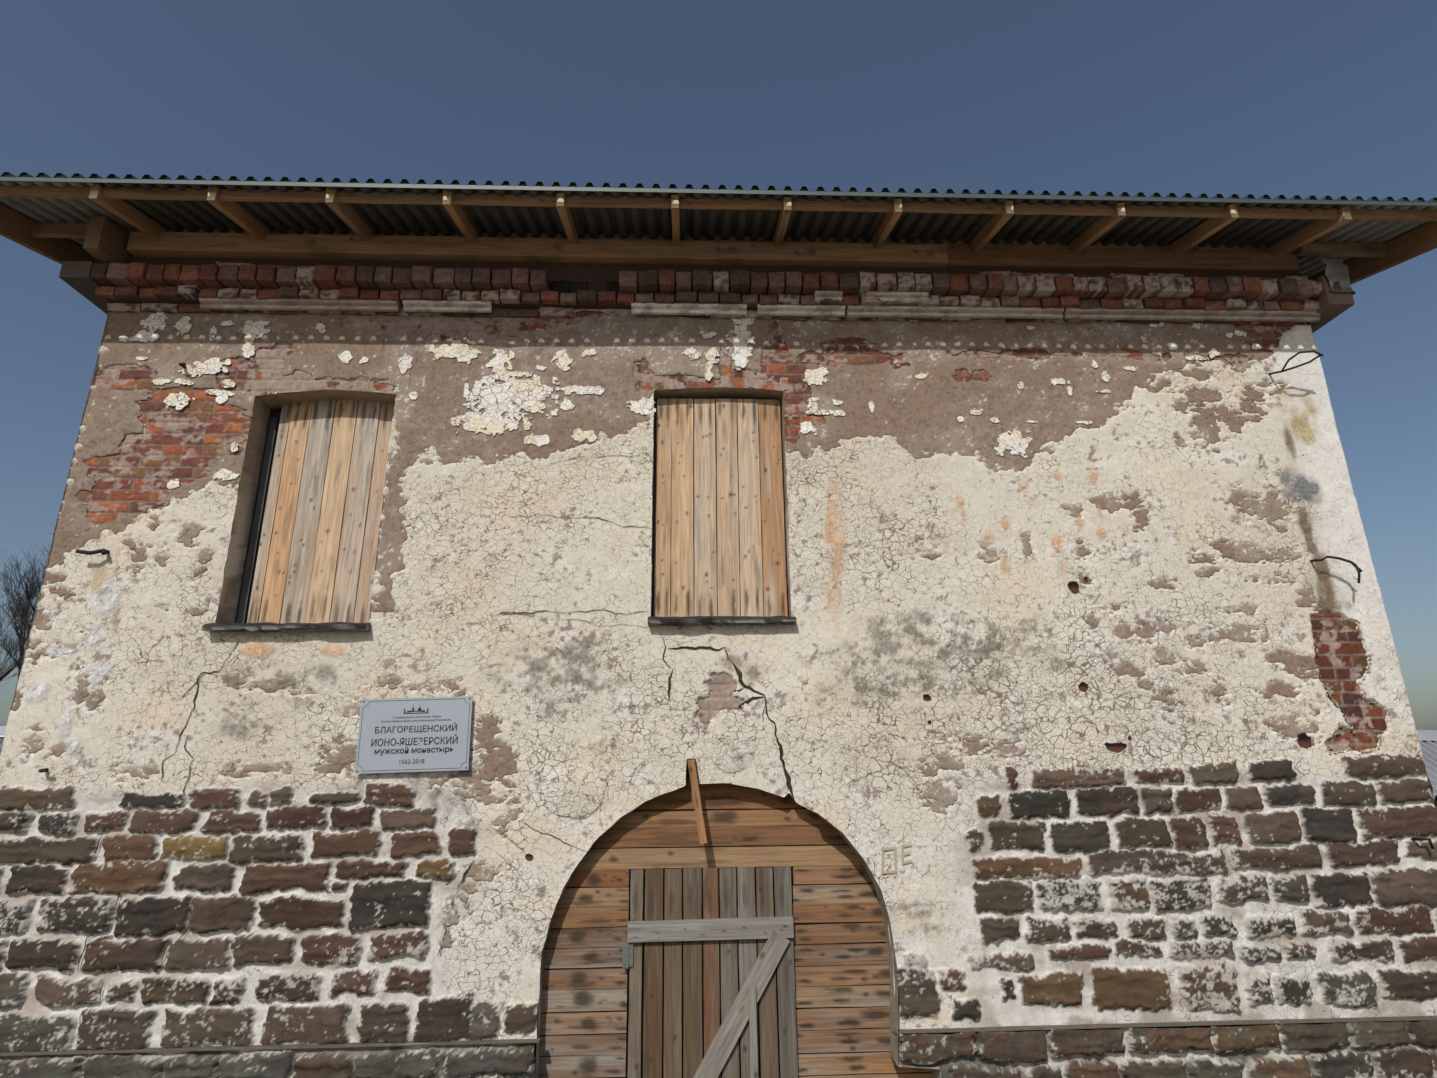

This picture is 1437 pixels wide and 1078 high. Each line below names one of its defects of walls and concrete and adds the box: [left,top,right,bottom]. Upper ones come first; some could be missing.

spalling [551,281,620,295]
flaking render [27,310,1292,711]
flaking render [1082,483,1390,754]
flaking render [12,691,23,711]
crack [161,640,239,795]
flaking render [342,699,360,717]
crack [492,609,795,803]
flaking render [24,726,72,759]
flaking render [111,767,160,782]
flaking render [221,762,292,778]
flaking render [313,737,357,774]